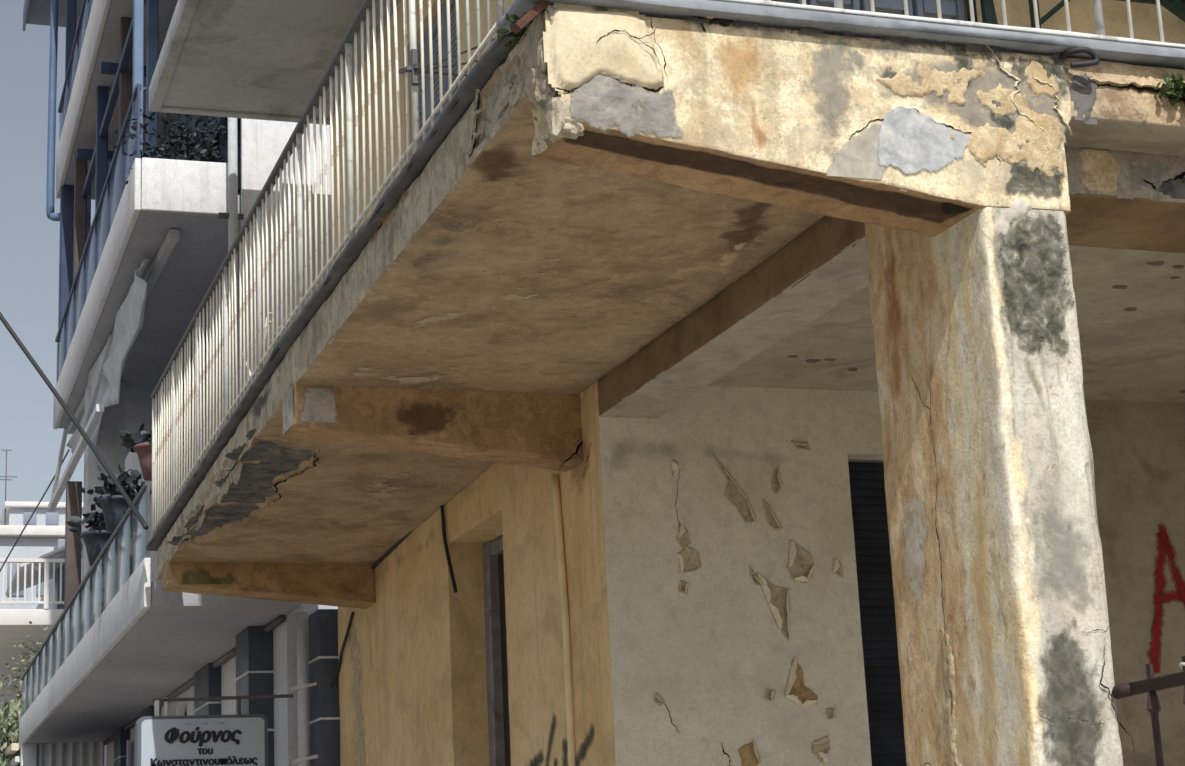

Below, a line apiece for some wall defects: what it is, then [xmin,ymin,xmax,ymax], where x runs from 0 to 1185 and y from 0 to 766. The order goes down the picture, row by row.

spalling [498,5,683,142]
peeling [827,51,1098,184]
crack [986,44,1073,156]
mould [1006,163,1065,198]
crack [1090,75,1185,101]
mould [999,213,1075,391]
spalling [167,385,337,545]
crack [559,424,592,476]
peeling [713,454,815,642]
damp [1034,509,1094,606]
peeling [764,656,836,719]
damp [1038,620,1104,766]